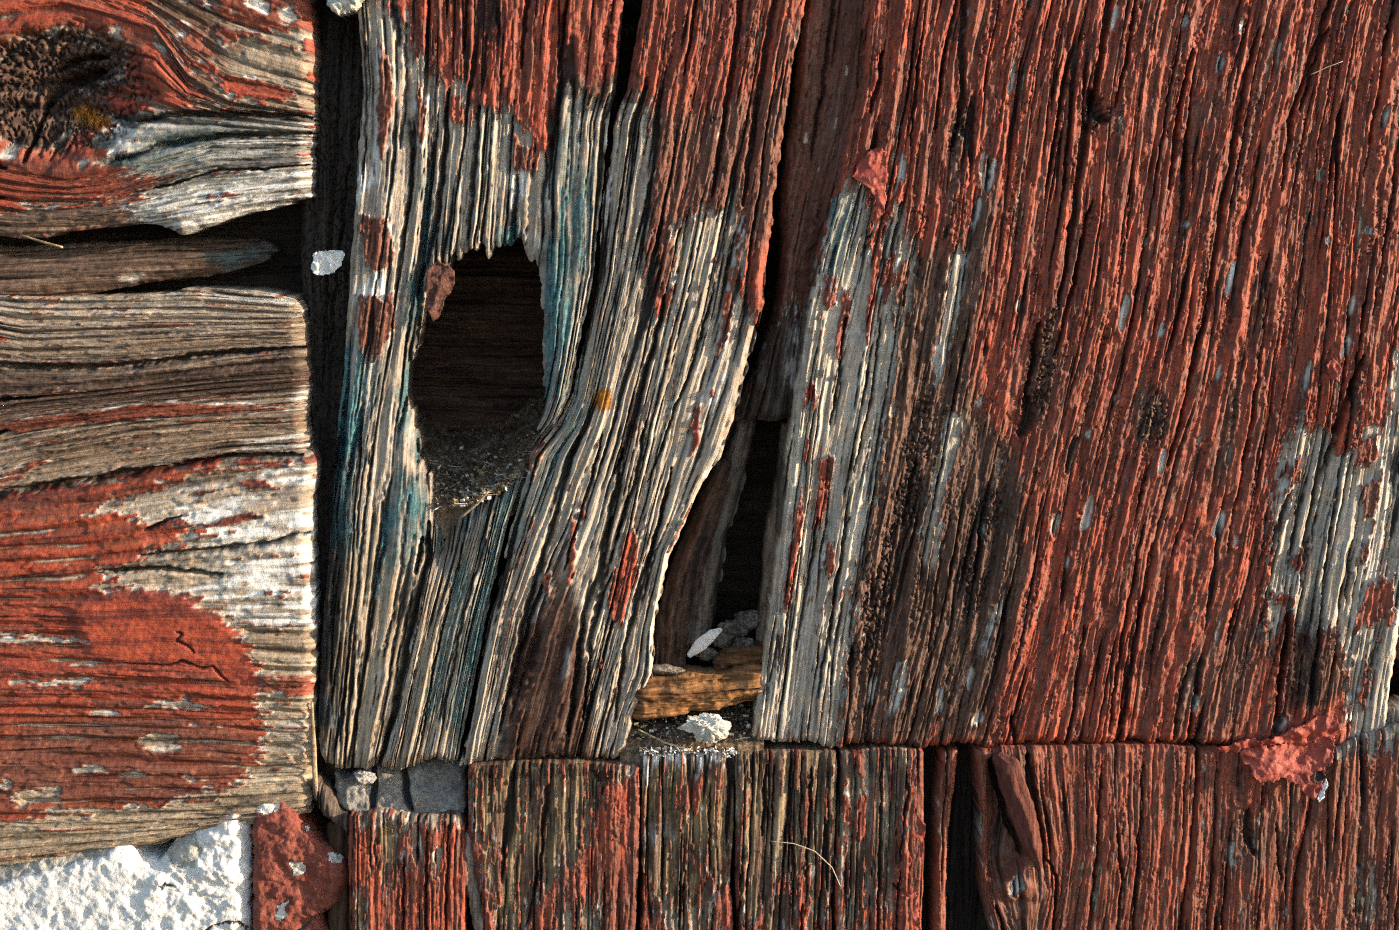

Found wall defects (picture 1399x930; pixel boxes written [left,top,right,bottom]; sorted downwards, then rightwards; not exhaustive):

peeling [933,226,969,385]
crack [1166,29,1258,465]
peeling [1300,333,1351,397]
peeling [0,0,935,930]
crack [884,457,918,635]
peeling [918,395,983,573]
crack [928,514,985,652]
crack [977,525,1152,930]
crack [1173,665,1188,736]
crack [1225,600,1237,644]
peeling [1240,346,1399,802]
peeling [945,741,982,930]